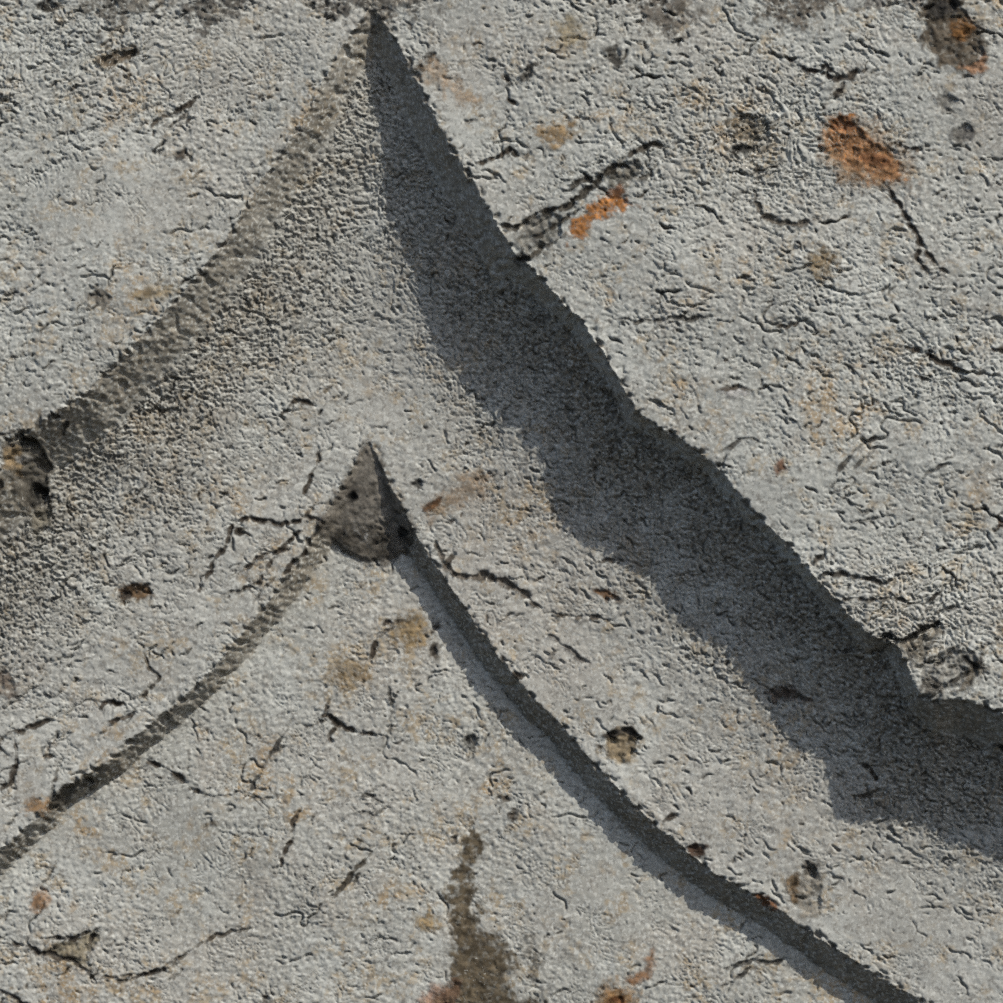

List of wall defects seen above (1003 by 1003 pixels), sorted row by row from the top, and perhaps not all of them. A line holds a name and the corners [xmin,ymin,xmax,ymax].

crack [477,146,530,165]
corrosion [823,113,907,183]
crack [502,141,662,258]
corrosion [570,185,627,239]
crack [888,189,947,274]
crack [281,398,313,415]
spalling [0,430,54,531]
crack [199,451,321,598]
leakage [423,830,547,1003]
crack [0,928,248,983]
corrosion [604,990,631,1003]
corrosion [628,956,653,983]